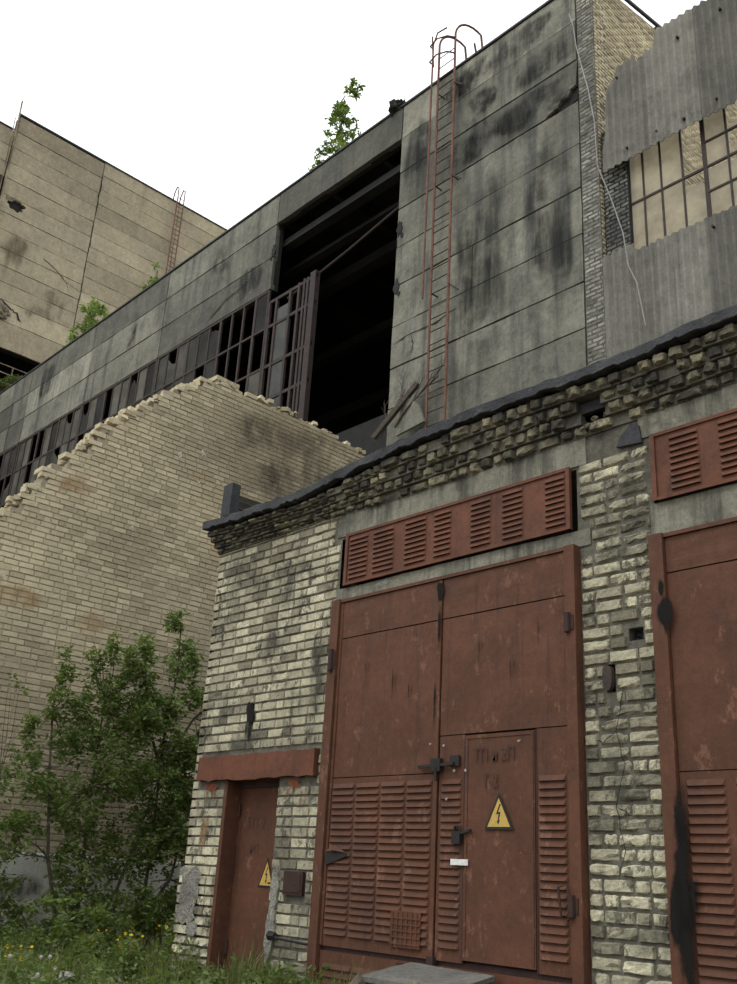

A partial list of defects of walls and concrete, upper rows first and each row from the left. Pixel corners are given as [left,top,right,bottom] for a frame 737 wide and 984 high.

damp [451,60,491,97]
damp [495,65,554,134]
hole [6,195,23,213]
crack [43,178,103,313]
damp [535,191,572,268]
spalling [0,301,11,320]
damp [466,255,498,306]
damp [674,788,697,984]